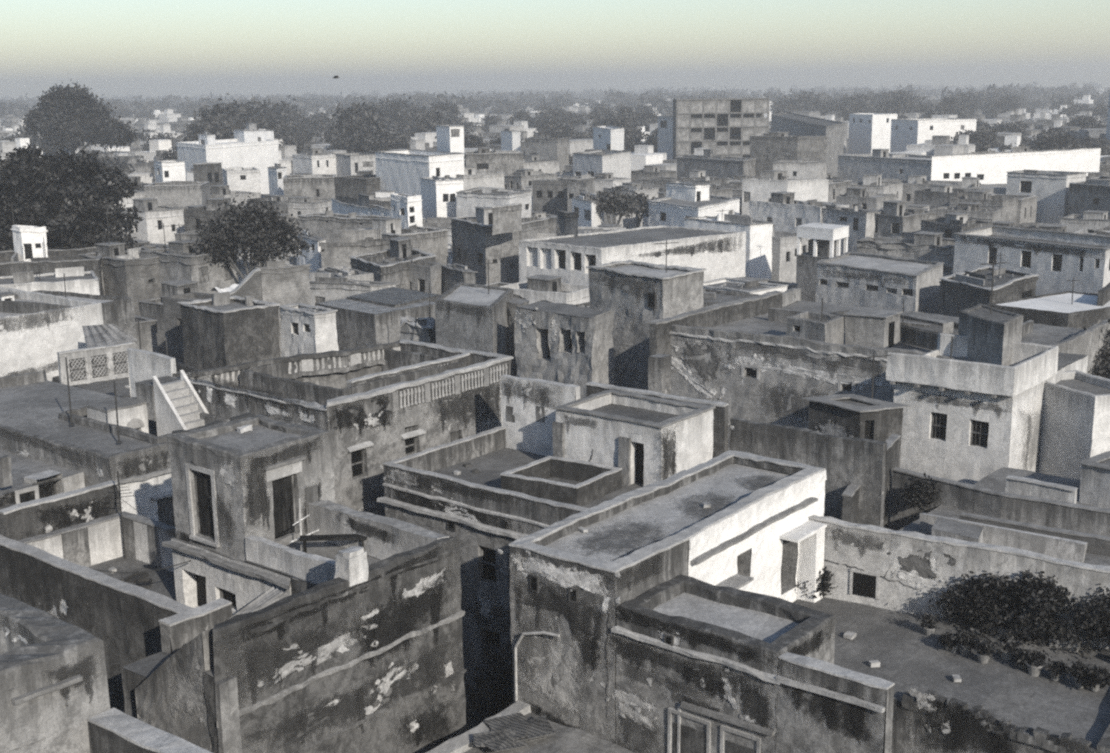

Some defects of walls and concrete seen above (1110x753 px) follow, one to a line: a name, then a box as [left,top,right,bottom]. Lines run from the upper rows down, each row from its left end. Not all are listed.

leakage [339,518,393,542]
peeling [402,568,446,599]
peeling [497,549,620,613]
leakage [580,523,662,590]
leakage [686,493,731,519]
leakage [738,475,779,490]
peeling [874,542,956,588]
peeling [257,608,379,688]
leakage [227,549,449,745]
peeling [364,662,419,715]
peeling [443,661,454,678]
leakage [476,578,770,728]